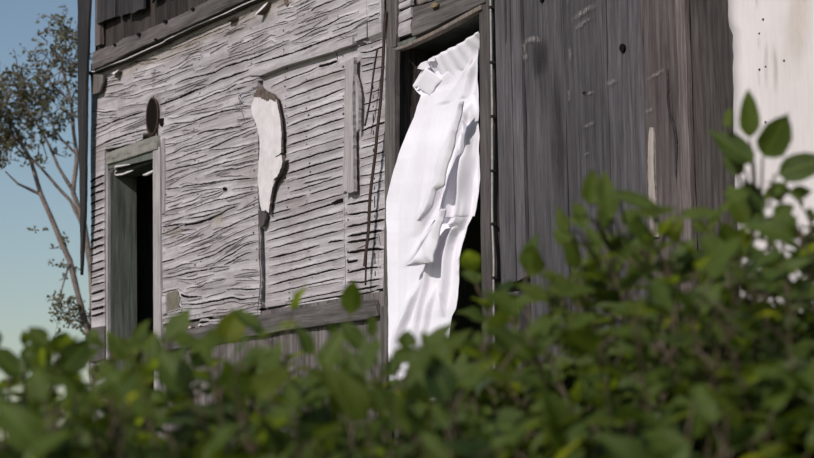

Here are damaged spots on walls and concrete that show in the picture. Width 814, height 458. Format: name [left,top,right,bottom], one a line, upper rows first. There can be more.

spalling [253,86,278,102]
peeling [271,155,286,180]